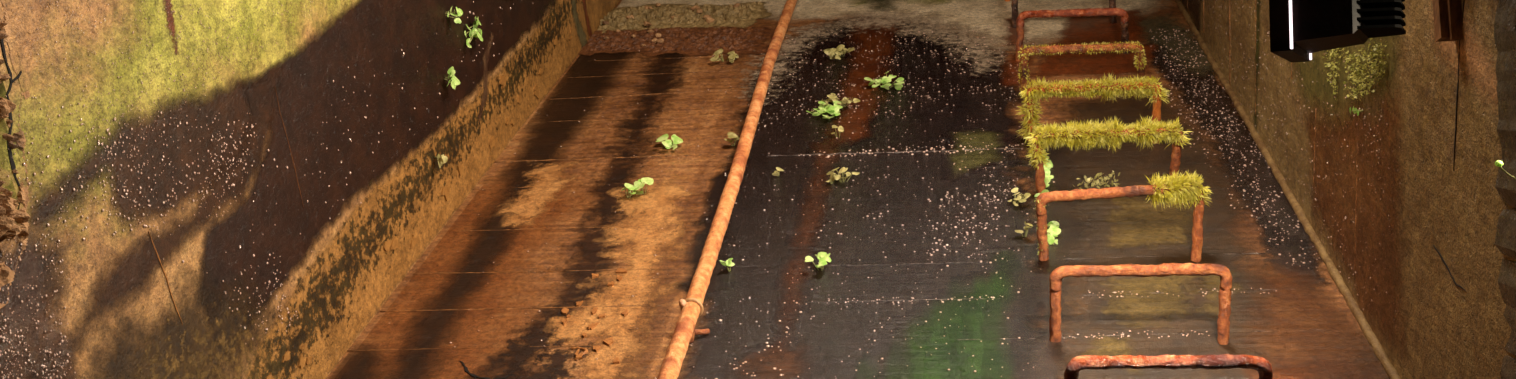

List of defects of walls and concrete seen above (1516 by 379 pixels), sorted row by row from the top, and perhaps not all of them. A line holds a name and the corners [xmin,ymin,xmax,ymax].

spalling [0,0,30,309]
water stain [678,0,1327,379]
rust [1006,10,1155,85]